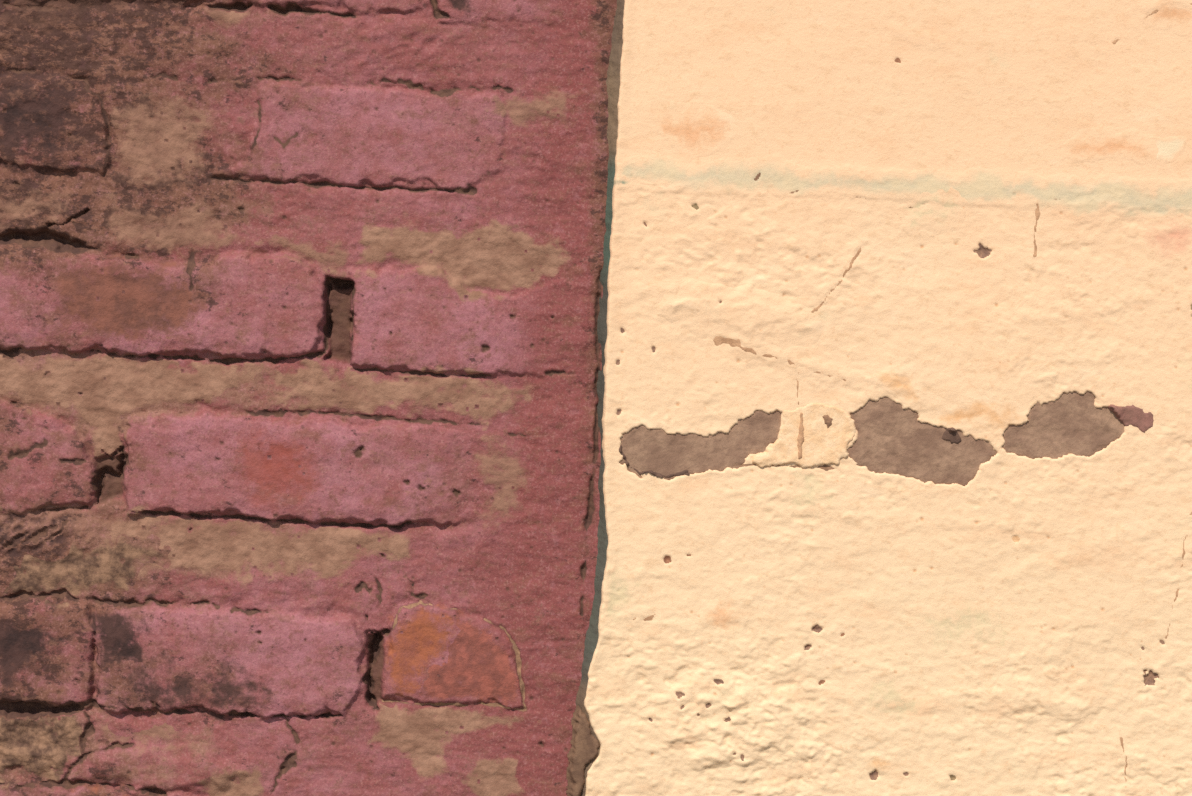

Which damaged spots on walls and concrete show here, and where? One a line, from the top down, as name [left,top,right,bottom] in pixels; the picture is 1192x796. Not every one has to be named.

spalling [973,243,992,258]
peeling [566,0,625,796]
peeling [619,391,1154,486]